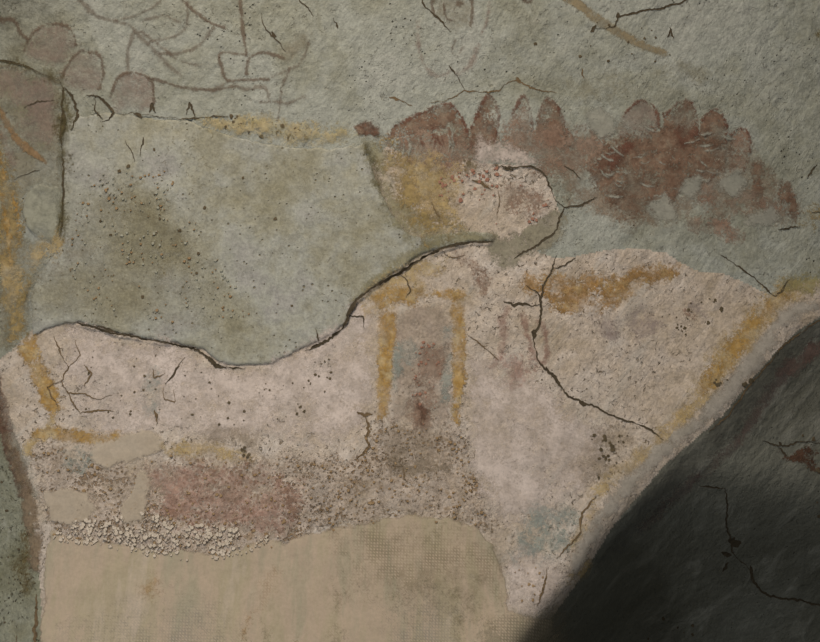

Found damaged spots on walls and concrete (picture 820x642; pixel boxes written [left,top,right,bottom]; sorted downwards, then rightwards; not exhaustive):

crack [422,0,451,32]
crack [590,0,686,38]
crack [305,241,493,351]
crack [496,165,660,437]
crack [47,322,242,425]
crack [700,485,820,606]